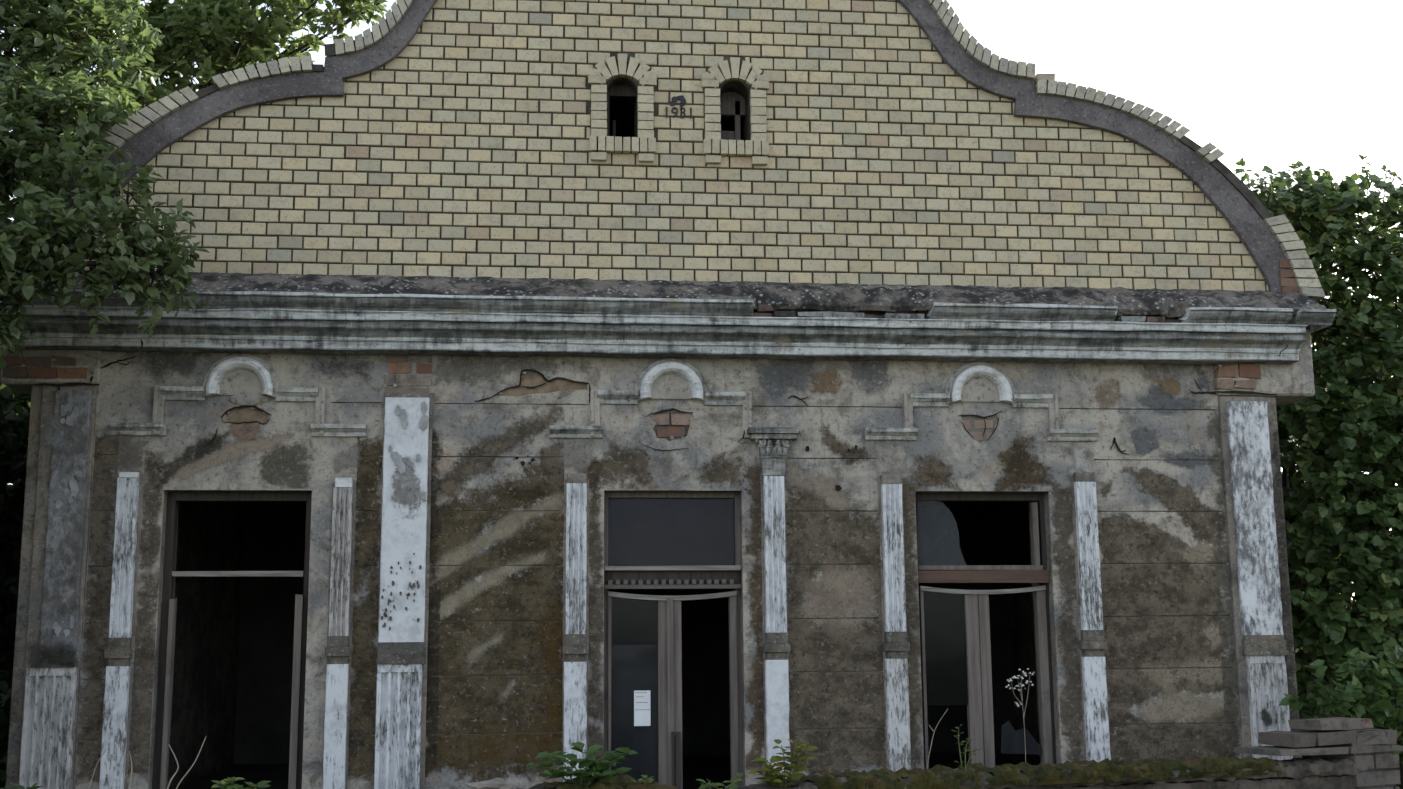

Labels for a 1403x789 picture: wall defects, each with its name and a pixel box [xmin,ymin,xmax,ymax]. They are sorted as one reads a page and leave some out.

spalling [496,371,588,397]
water stain [1139,364,1211,414]
spalling [1213,363,1261,390]
peeling [172,407,294,480]
water stain [261,444,312,489]
peeling [388,445,426,517]
water stain [425,405,653,782]
water stain [1098,416,1239,762]